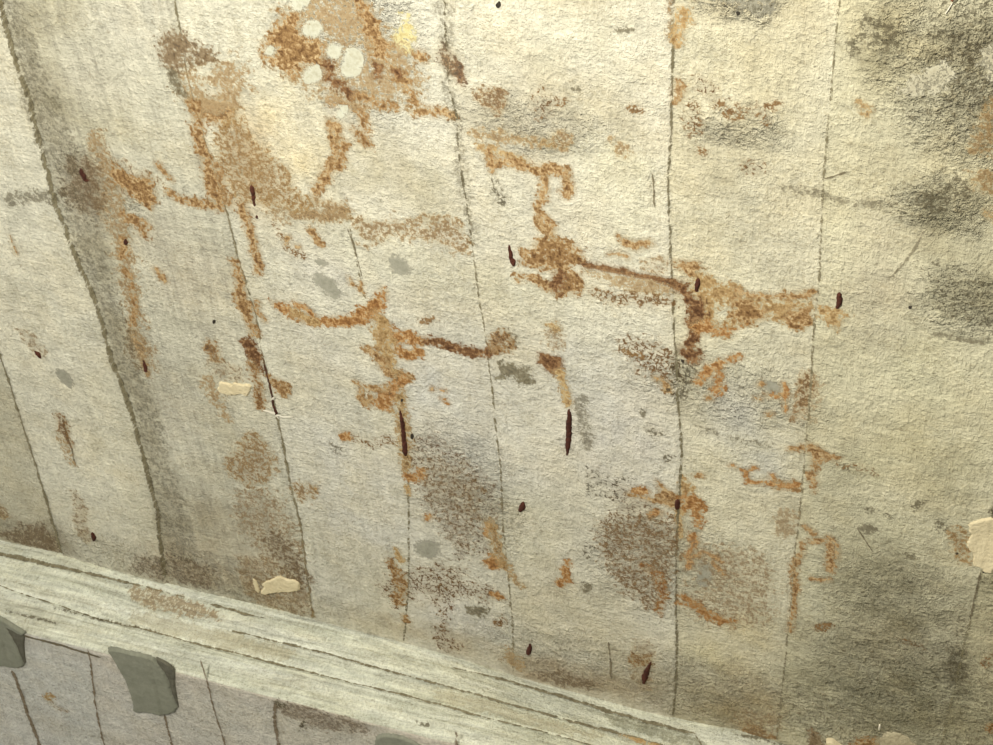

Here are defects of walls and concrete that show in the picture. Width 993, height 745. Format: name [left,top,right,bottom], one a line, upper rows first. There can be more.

corrosion [665,0,695,49]
corrosion [854,99,873,118]
corrosion [467,74,849,408]
corrosion [86,0,526,651]
peeling [217,381,252,396]
corrosion [754,369,824,422]
corrosion [731,443,878,494]
peeling [253,575,300,595]
corrosion [554,558,574,588]
corrosion [593,473,775,630]
corrosion [774,508,839,633]
peeling [967,517,993,573]